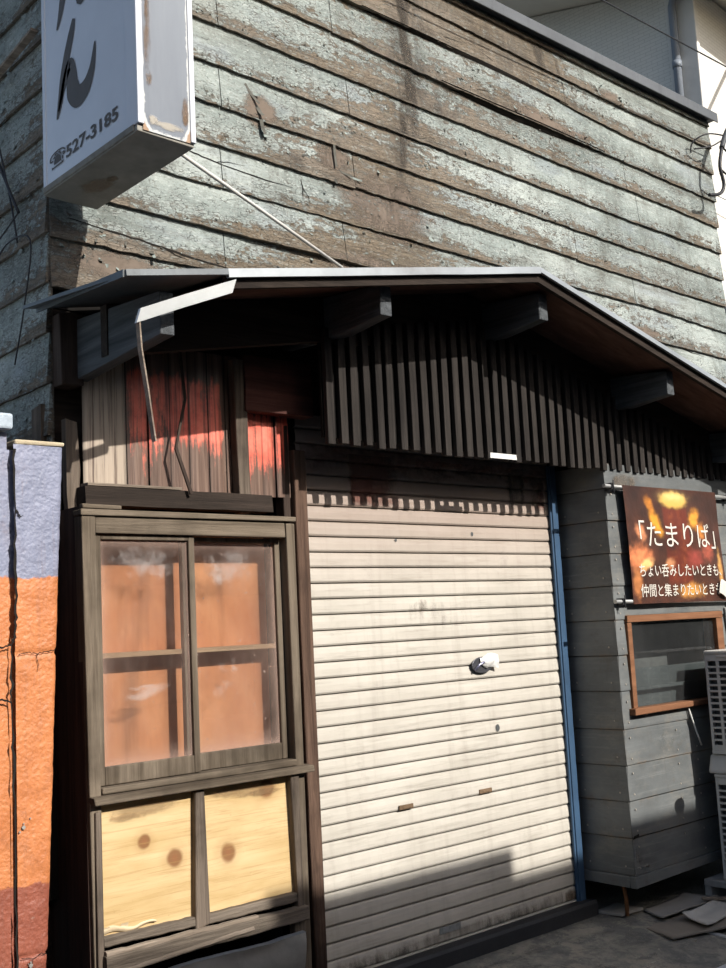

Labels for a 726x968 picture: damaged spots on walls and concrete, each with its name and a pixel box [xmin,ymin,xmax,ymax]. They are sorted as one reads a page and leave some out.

peeling [244,83,276,137]
peeling [514,105,592,144]
peeling [310,138,435,268]
peeling [71,235,174,276]
peeling [635,324,673,339]
rust [347,454,392,505]